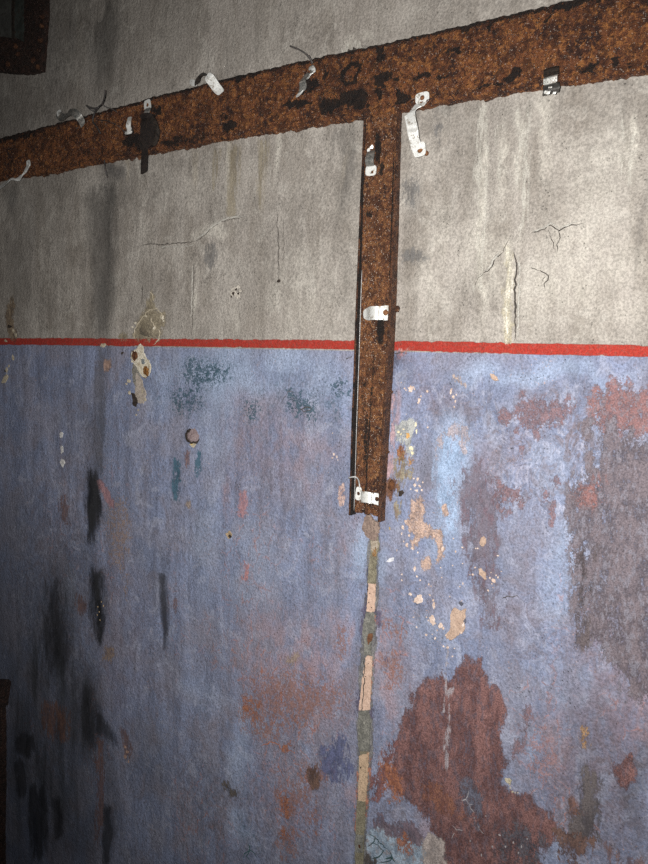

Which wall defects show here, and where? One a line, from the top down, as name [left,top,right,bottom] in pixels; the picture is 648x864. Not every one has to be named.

corrosion [0,0,648,182]
crack [144,215,245,336]
crack [474,240,549,340]
crack [533,221,582,251]
peeling [118,290,166,416]
peeling [386,477,466,657]
peeling [459,567,502,592]